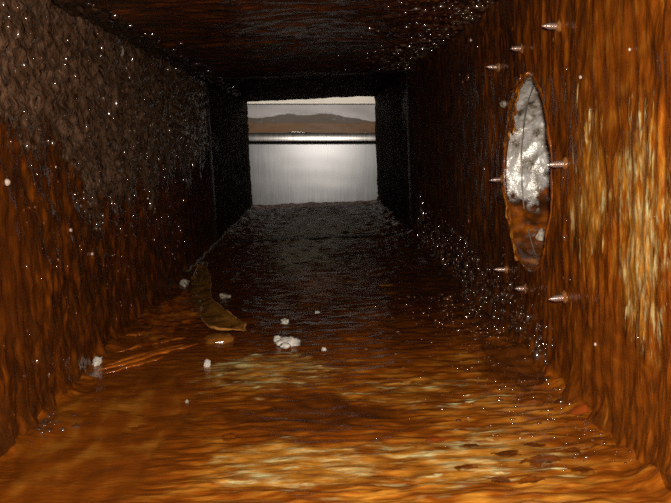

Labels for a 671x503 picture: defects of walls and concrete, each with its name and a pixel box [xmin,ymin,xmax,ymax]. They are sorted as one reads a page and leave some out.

peeling [499,72,530,149]
rust [570,0,657,158]
rust [0,165,56,384]
peeling [502,185,519,261]
water stain [625,97,661,340]
rust [478,343,551,390]
rust [558,302,659,425]
rust [0,368,216,503]